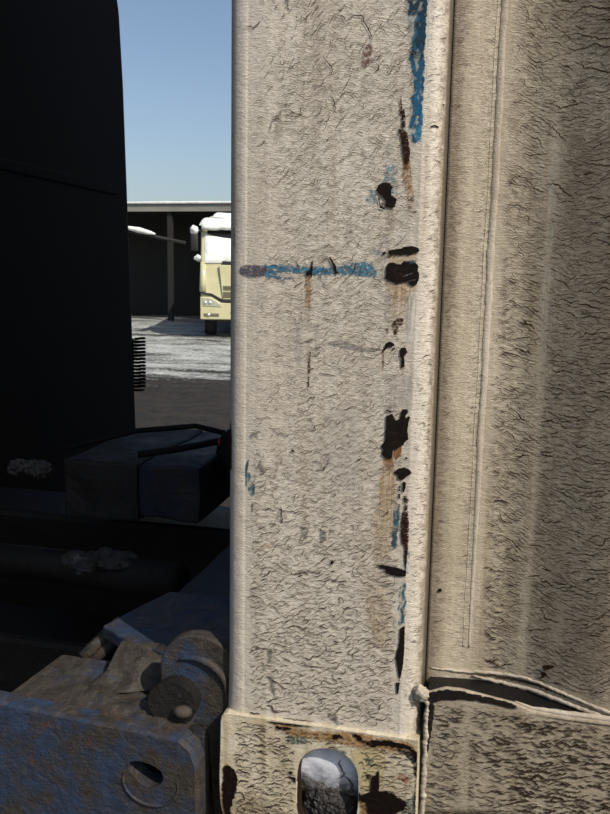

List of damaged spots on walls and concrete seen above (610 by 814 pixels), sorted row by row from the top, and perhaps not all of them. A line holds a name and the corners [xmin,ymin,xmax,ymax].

corrosion [403,159,416,213]
peeling [370,246,419,286]
peeling [383,342,408,368]
peeling [381,409,410,459]
peeling [394,457,412,512]
corrosion [400,512,409,569]
peeling [377,565,406,577]
peeling [359,767,406,814]